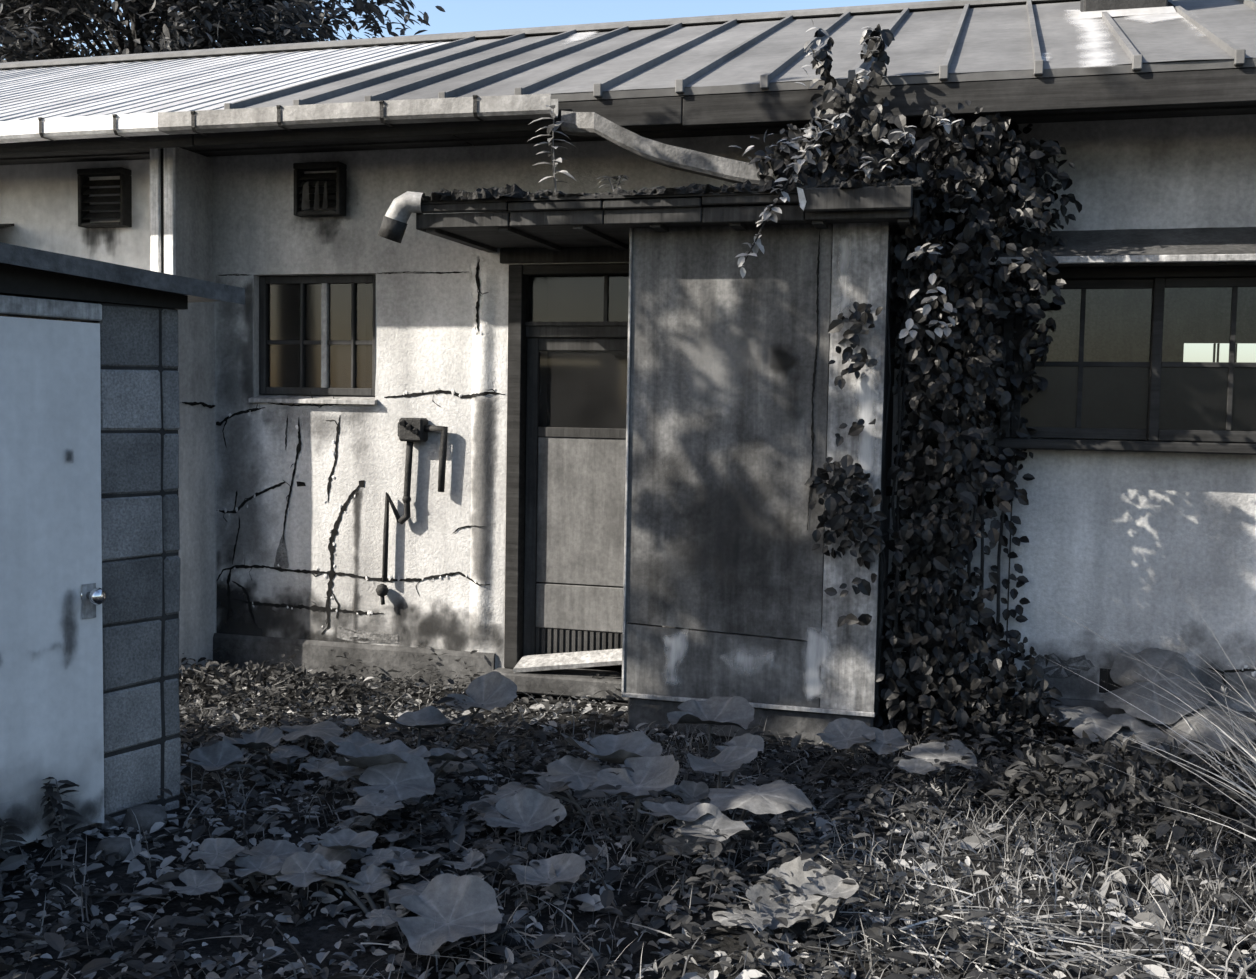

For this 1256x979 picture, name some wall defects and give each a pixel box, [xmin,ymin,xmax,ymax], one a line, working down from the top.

crack [379,256,488,335]
crack [182,392,490,634]
leakage [672,482,792,598]
leakage [216,582,503,652]
peeling [665,634,687,682]
peeling [805,630,829,698]
leakage [1035,653,1115,700]
leakage [1195,660,1256,712]